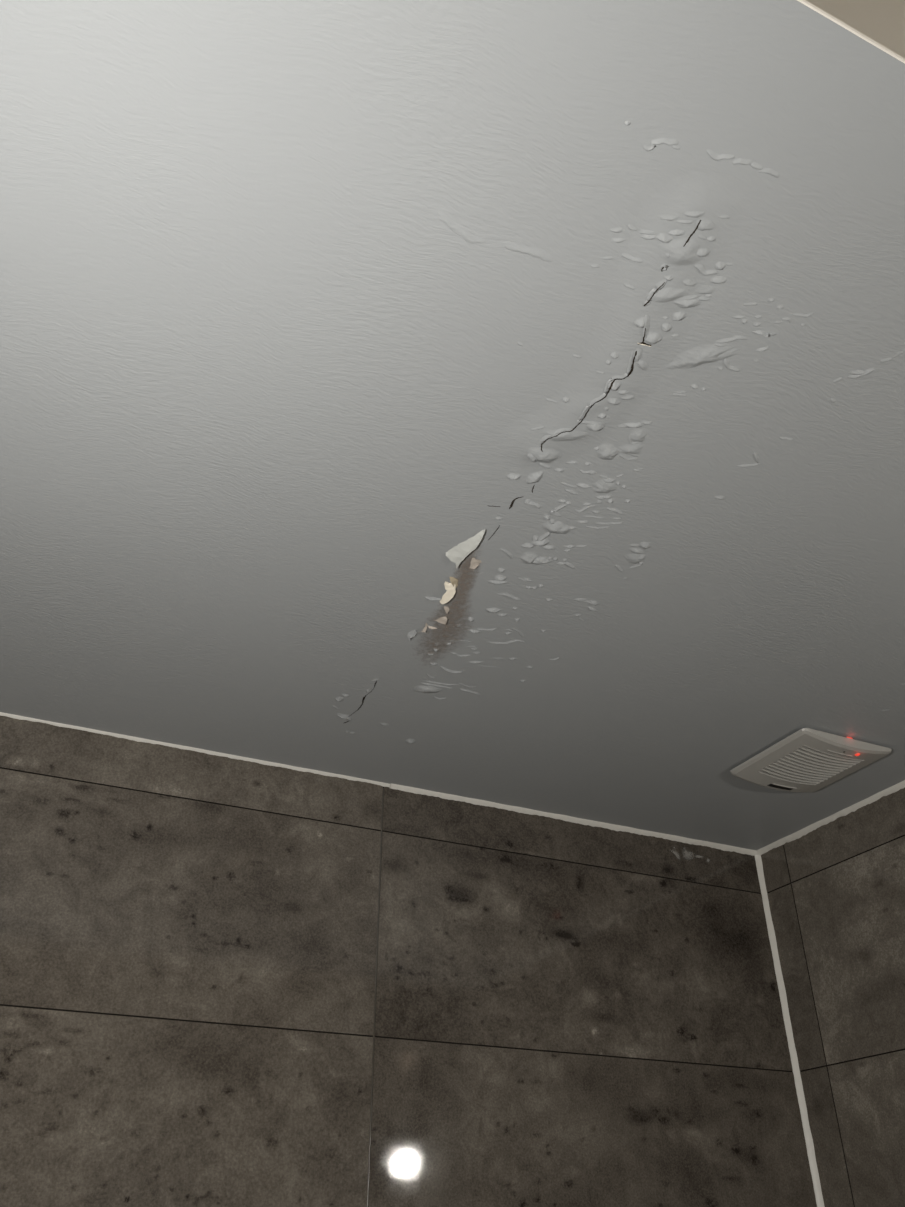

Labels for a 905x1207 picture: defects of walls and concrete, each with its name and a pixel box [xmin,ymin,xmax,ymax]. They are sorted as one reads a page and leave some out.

crack [539,220,701,452]
crack [490,486,534,538]
peeling [407,529,485,641]